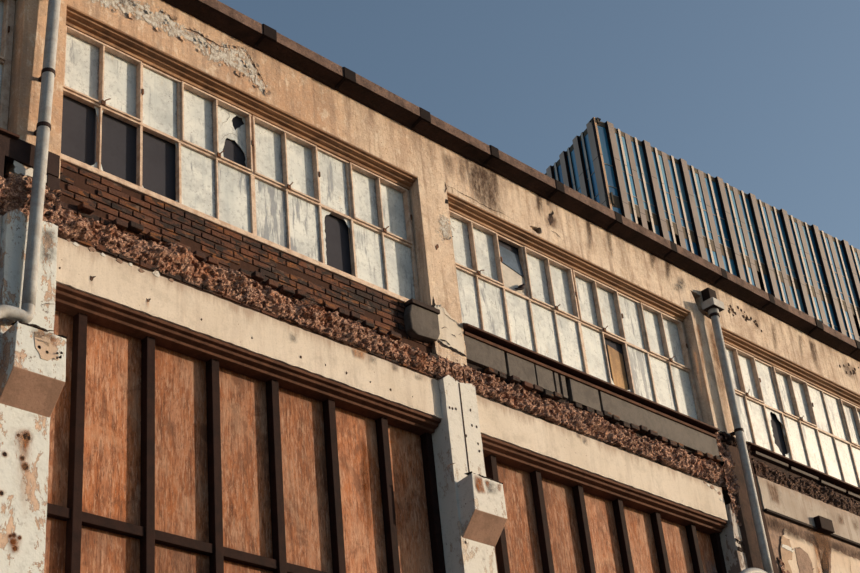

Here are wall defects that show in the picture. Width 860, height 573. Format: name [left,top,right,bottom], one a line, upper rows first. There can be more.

peeling [92,0,271,96]
spalling [0,160,33,216]
peeling [10,321,67,361]
spalling [43,175,860,526]
peeling [777,536,831,573]